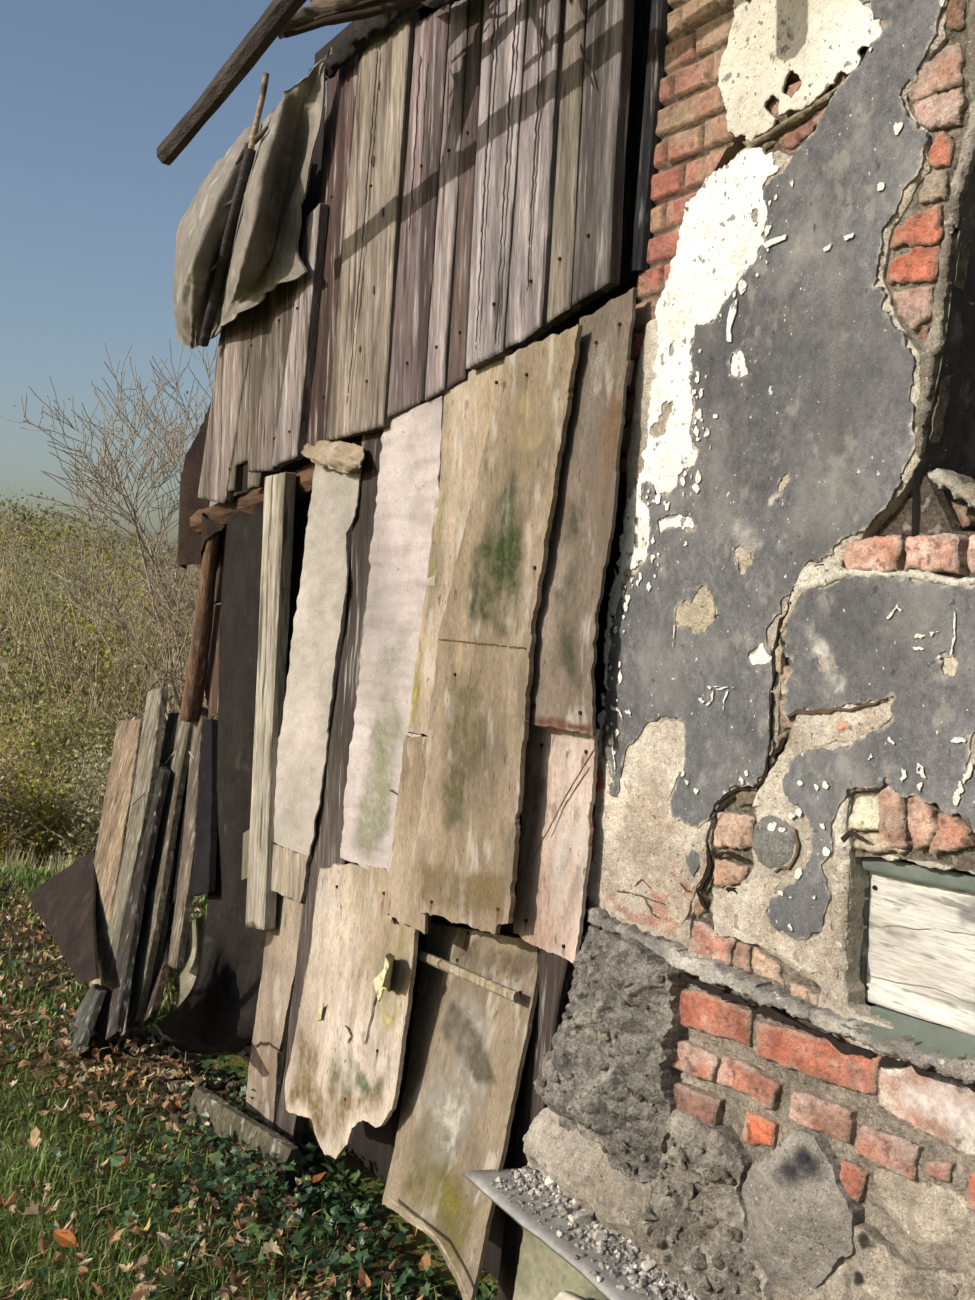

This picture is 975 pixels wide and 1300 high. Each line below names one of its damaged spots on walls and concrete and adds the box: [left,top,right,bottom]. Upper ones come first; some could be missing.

damp [470,489,520,619]
peeling [587,0,975,978]
crack [664,564,975,1092]
spalling [671,988,975,1211]